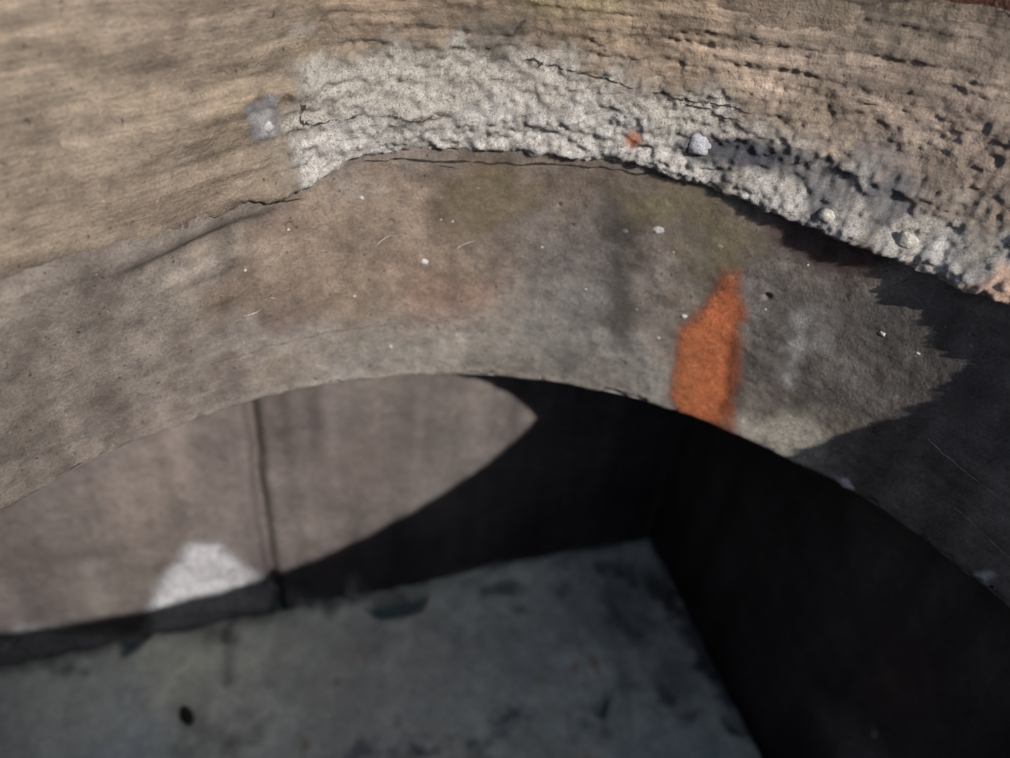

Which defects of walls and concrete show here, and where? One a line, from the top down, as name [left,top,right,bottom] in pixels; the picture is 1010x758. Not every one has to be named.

crack [510,19,527,37]
crack [526,58,753,123]
crack [300,104,672,178]
leakage [277,21,1010,293]
corrosion [672,272,745,428]